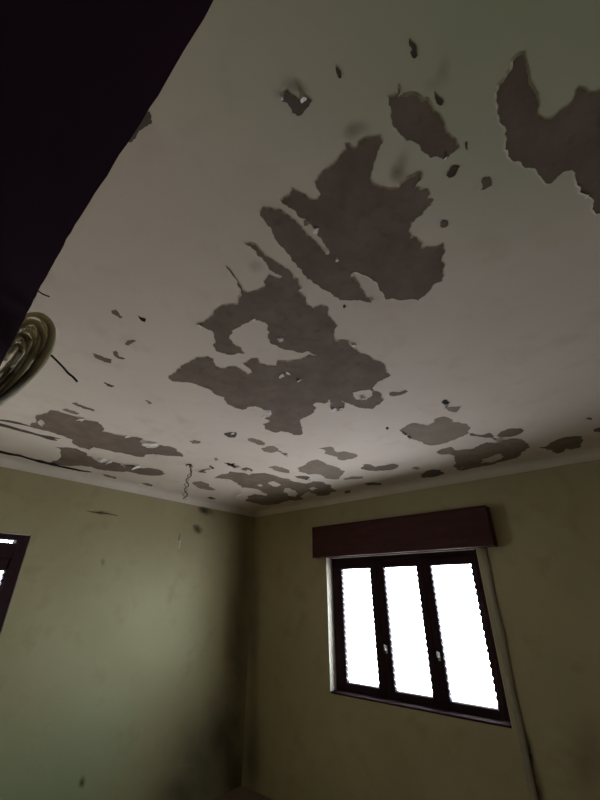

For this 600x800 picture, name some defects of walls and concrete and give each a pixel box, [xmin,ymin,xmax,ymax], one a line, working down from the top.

peeling [280,91,312,116]
peeling [387,84,468,178]
peeling [494,51,600,215]
peeling [167,134,446,435]
crack [0,420,60,441]
crack [0,450,90,472]
peeling [29,402,184,487]
peeling [192,446,399,505]
peeling [400,400,530,471]
peeling [540,436,583,453]